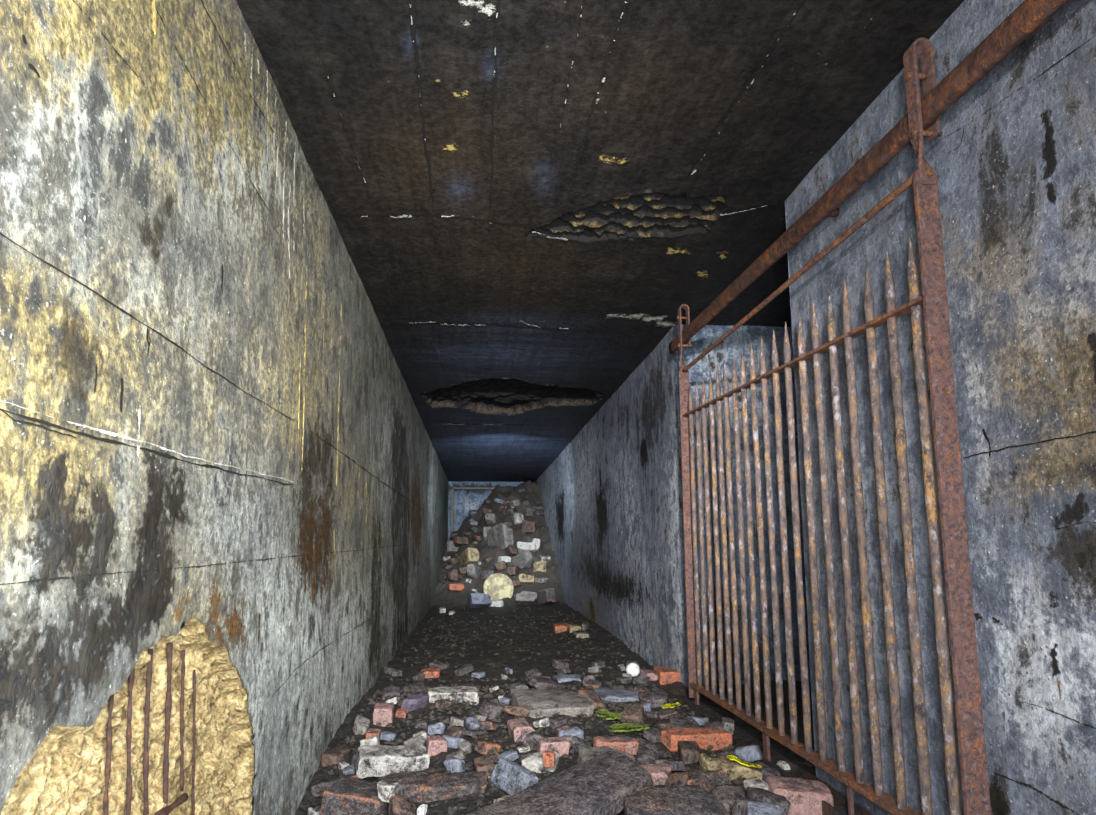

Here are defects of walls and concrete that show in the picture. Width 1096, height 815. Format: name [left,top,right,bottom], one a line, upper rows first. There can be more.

damp [1041,110,1058,204]
spalling [525,192,728,244]
crack [0,232,427,512]
spalling [419,378,606,415]
crack [964,429,1096,458]
corrosion [293,487,338,617]
damp [1039,493,1096,609]
spalling [0,618,255,815]